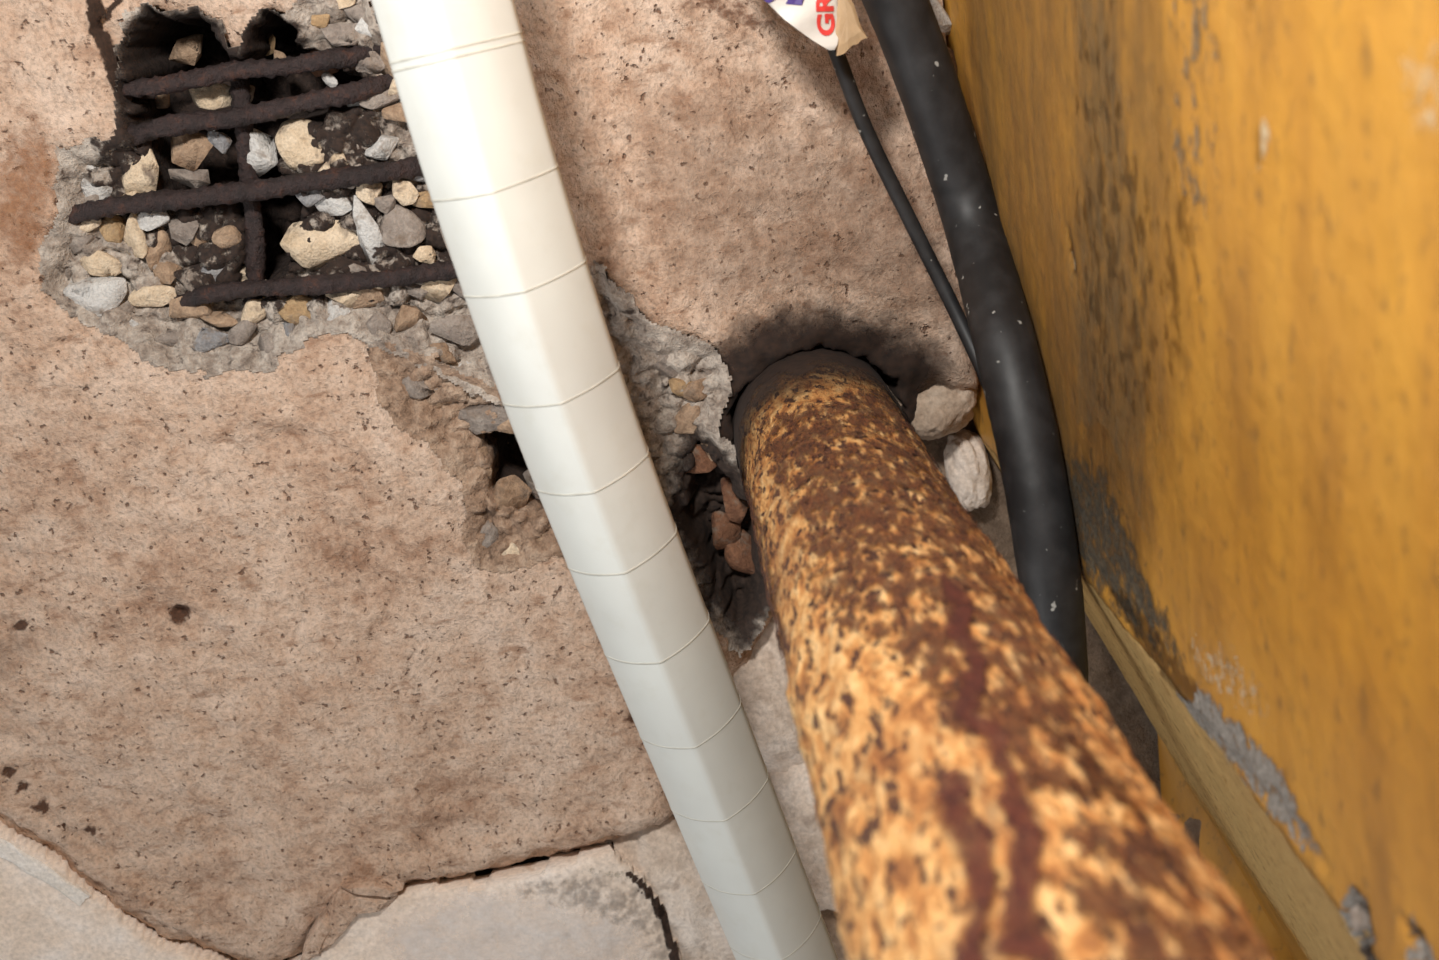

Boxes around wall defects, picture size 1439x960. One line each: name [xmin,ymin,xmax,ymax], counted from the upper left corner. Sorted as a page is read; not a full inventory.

crack [86,0,129,129]
spalling [38,0,564,574]
spalling [589,260,770,658]
spalling [2,767,28,793]
spalling [31,800,49,814]
peeling [1081,574,1376,960]
flaking render [301,876,404,960]
crack [626,871,680,960]